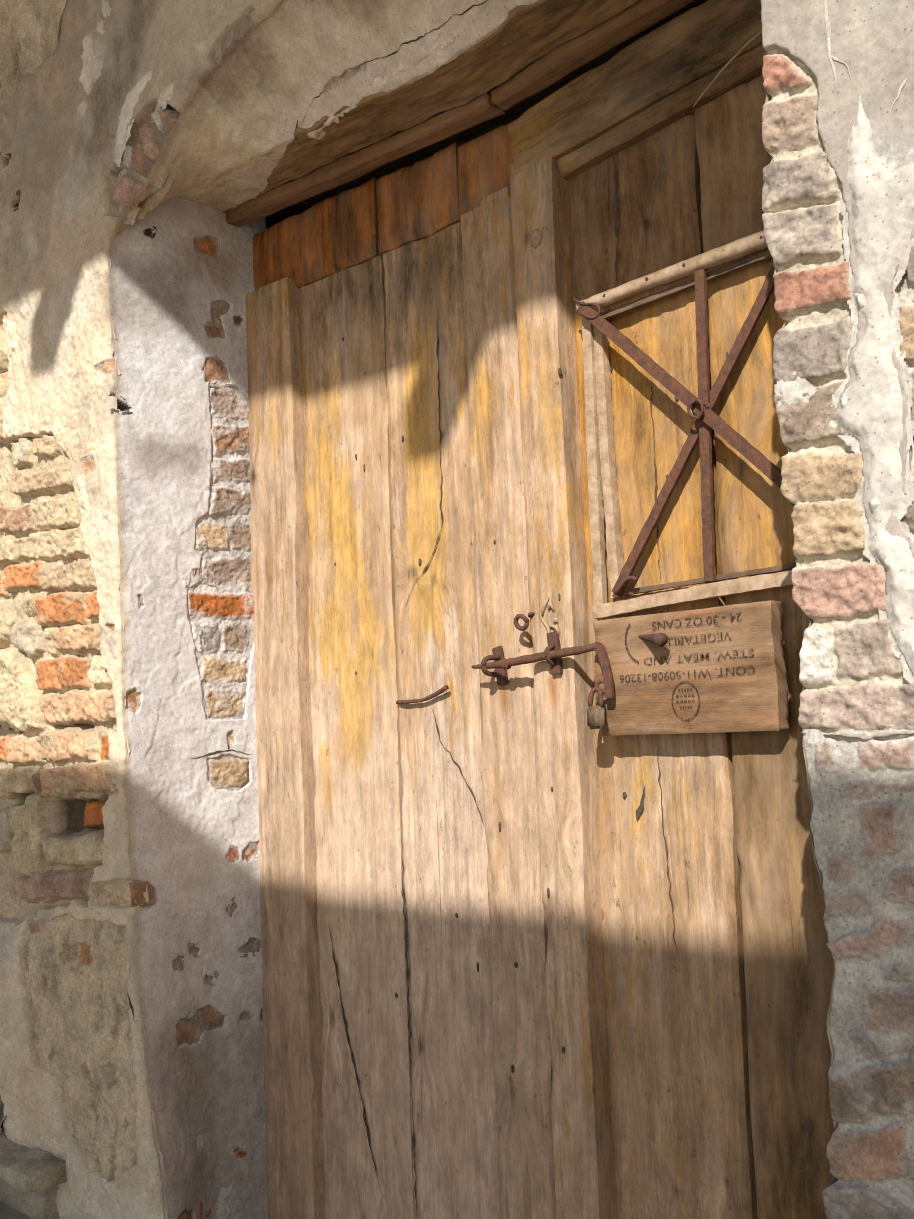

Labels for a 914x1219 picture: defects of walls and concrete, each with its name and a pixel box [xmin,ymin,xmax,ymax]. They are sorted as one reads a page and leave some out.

spalling [112,70,181,225]
crack [294,0,488,145]
peeling [181,356,254,791]
spalling [762,49,914,1219]
spalling [0,315,156,1182]
spalling [170,941,219,986]
spalling [176,1005,264,1045]
spalling [239,937,261,958]